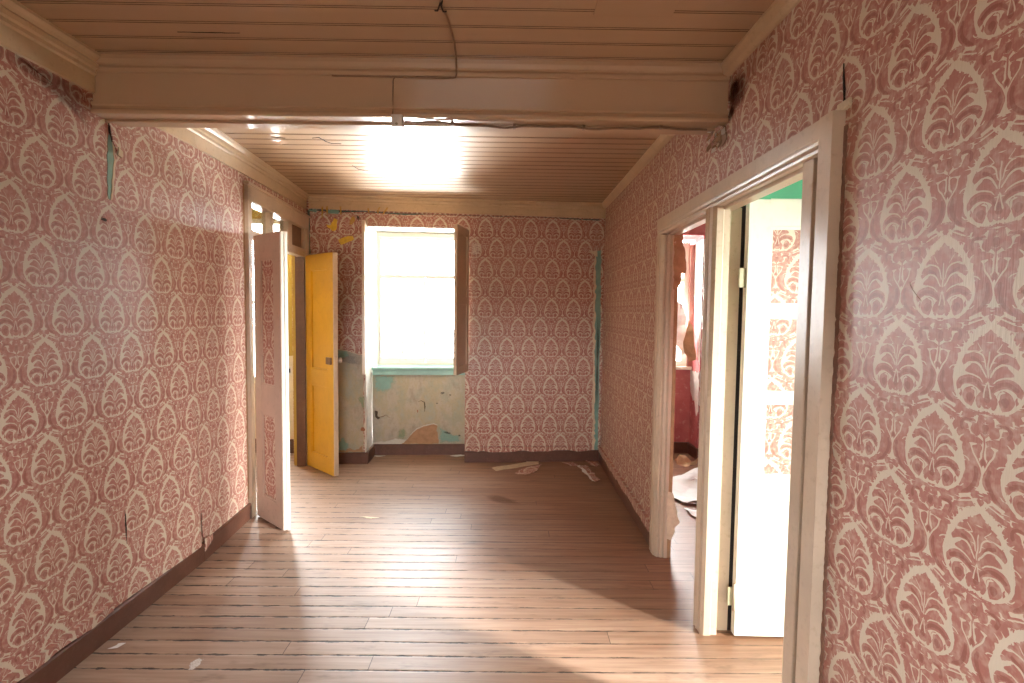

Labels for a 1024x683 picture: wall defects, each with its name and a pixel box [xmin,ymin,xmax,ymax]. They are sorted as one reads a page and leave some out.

peeling [107,123,123,200]
peeling [338,349,439,452]
peeling [588,250,602,450]
peeling [690,239,705,416]